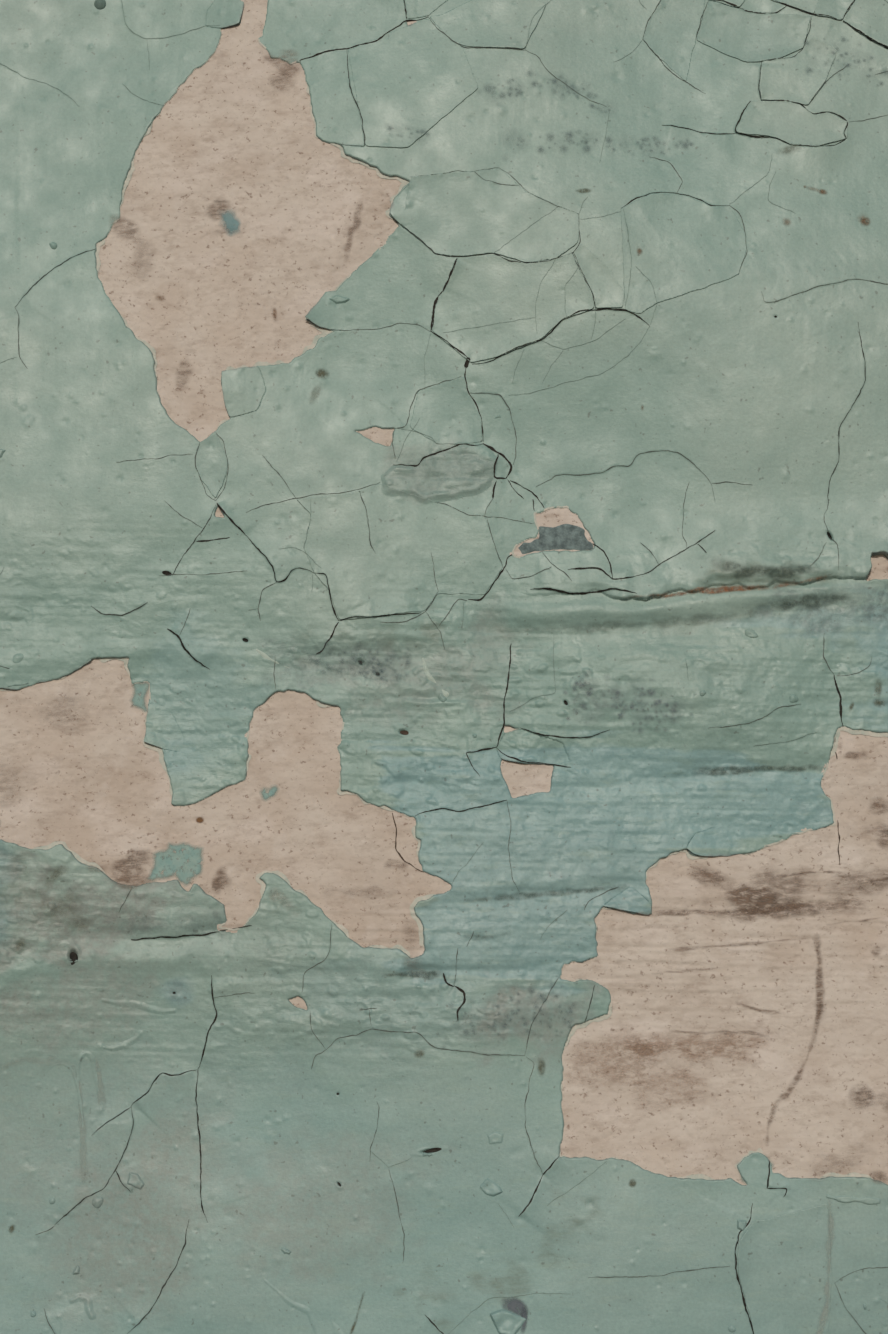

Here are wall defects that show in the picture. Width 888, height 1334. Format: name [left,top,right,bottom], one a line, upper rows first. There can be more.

peeling [95,0,746,446]
crack [121,0,888,654]
crack [91,603,146,616]
crack [167,610,209,669]
peeling [297,484,594,619]
crack [36,976,249,1333]
peeling [0,658,451,958]
crack [370,1103,412,1260]
crack [302,927,602,1227]
crack [425,1161,787,1334]
peeling [560,726,888,1185]
crack [835,1267,888,1334]